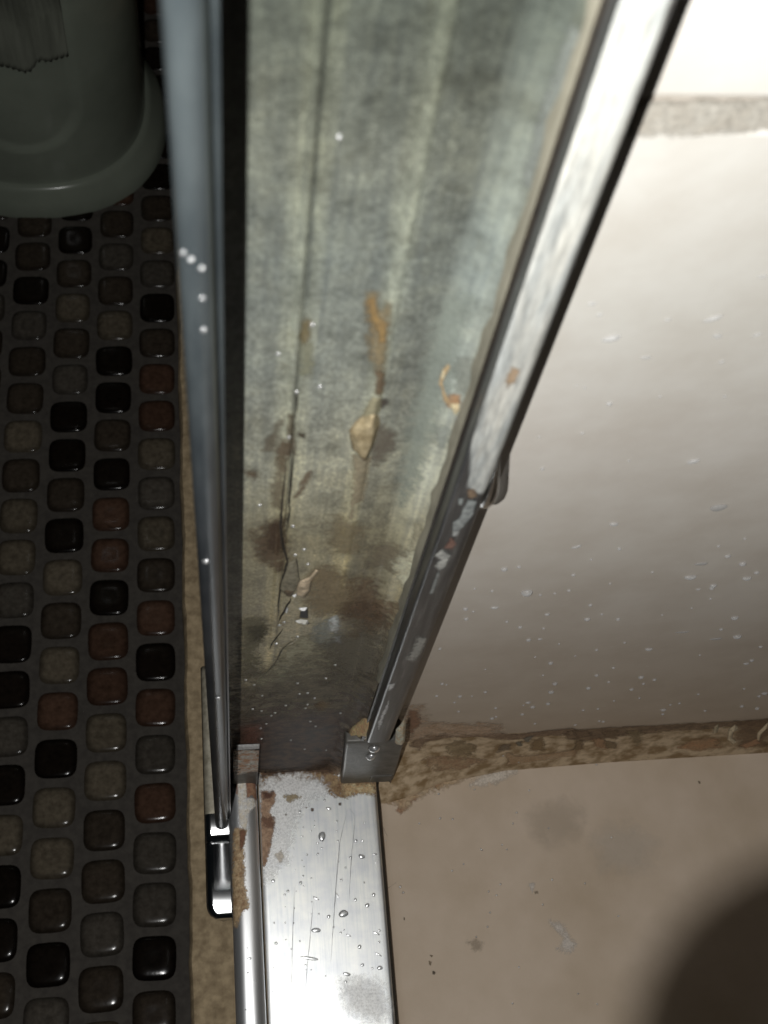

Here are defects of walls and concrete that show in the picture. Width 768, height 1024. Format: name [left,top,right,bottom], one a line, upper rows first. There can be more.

corrosion [364,292,391,395]
corrosion [438,364,461,414]
crack [262,445,299,677]
water stain [229,565,399,773]
peeling [395,720,406,745]